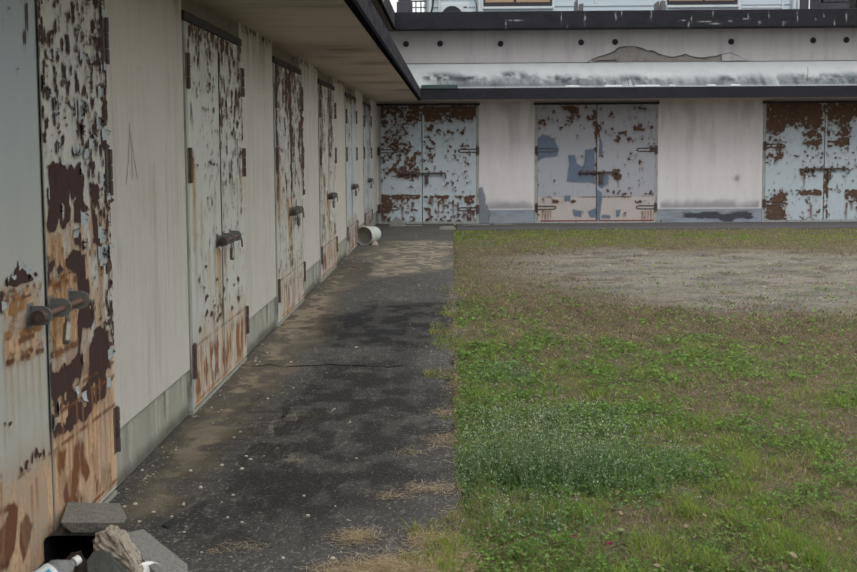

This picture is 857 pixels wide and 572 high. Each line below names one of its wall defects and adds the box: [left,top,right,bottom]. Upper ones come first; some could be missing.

water stain [425,73,683,87]
peeling [538,105,655,203]
peeling [0,0,116,439]
rust [0,217,117,572]
rust [195,312,246,406]
crack [243,362,403,370]
peeling [20,447,55,473]